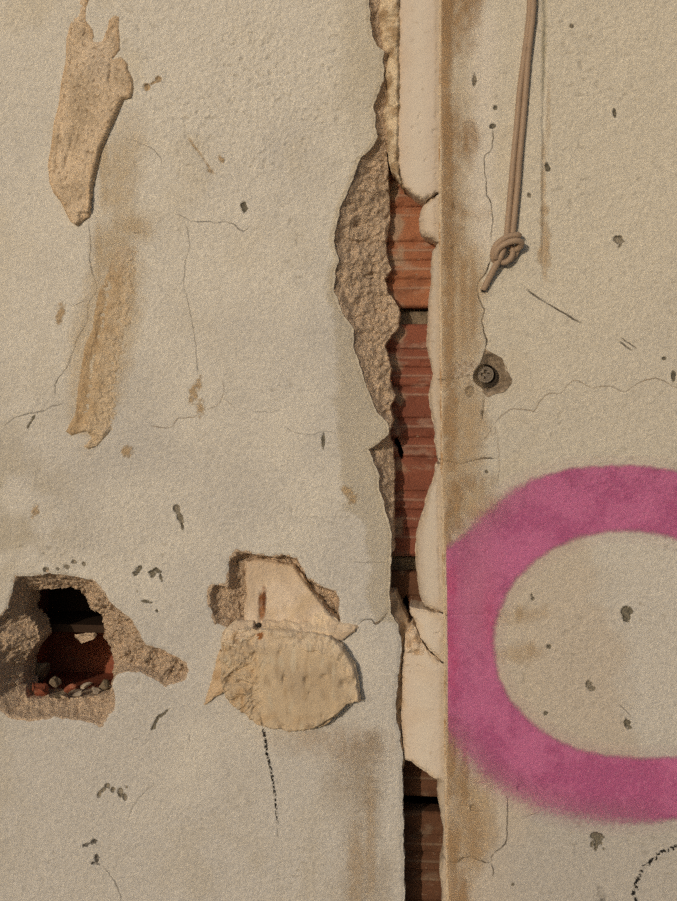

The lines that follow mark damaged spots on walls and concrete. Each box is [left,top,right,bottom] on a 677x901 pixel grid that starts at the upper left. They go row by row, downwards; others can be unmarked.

spalling [334,0,406,552]
water stain [442,250,480,364]
spalling [448,349,512,397]
spalling [0,560,189,728]
spalling [207,549,340,627]
spalling [389,587,441,768]